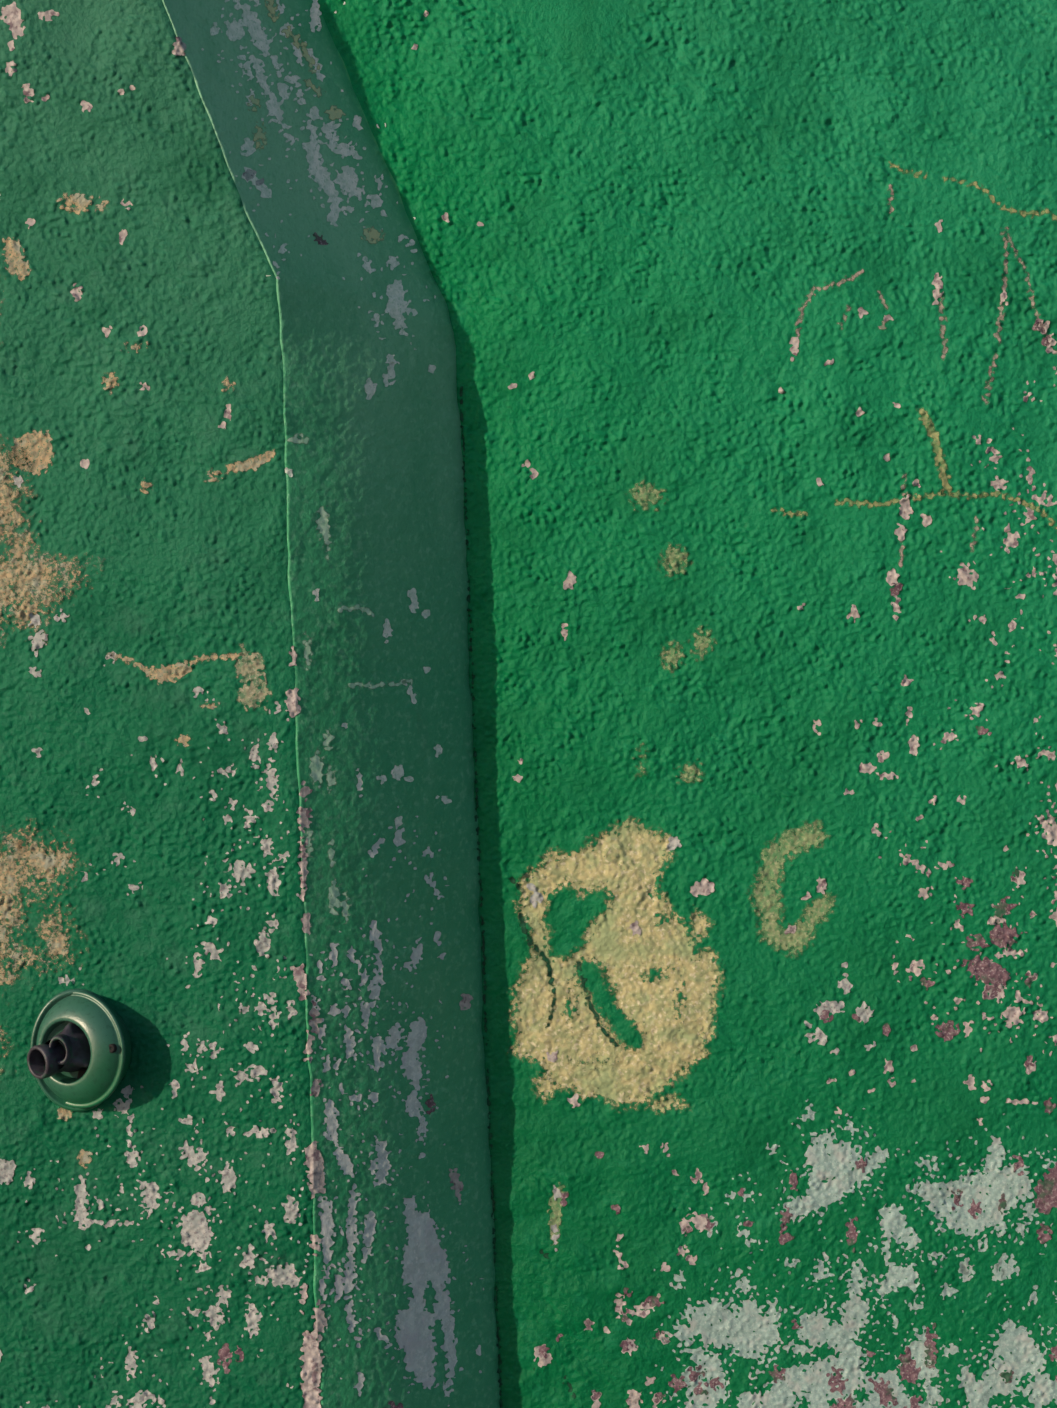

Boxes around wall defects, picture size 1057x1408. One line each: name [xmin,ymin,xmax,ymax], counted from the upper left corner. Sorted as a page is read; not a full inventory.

peeling [0,2,59,103]
peeling [172,0,436,400]
peeling [0,429,100,678]
peeling [949,427,1057,688]
peeling [859,750,899,780]
peeling [905,707,959,756]
peeling [947,699,992,736]
peeling [891,715,1057,1075]
peeling [0,643,484,1408]
peeling [547,1182,569,1252]
peeling [584,962,1057,1408]
peeling [534,1334,563,1367]